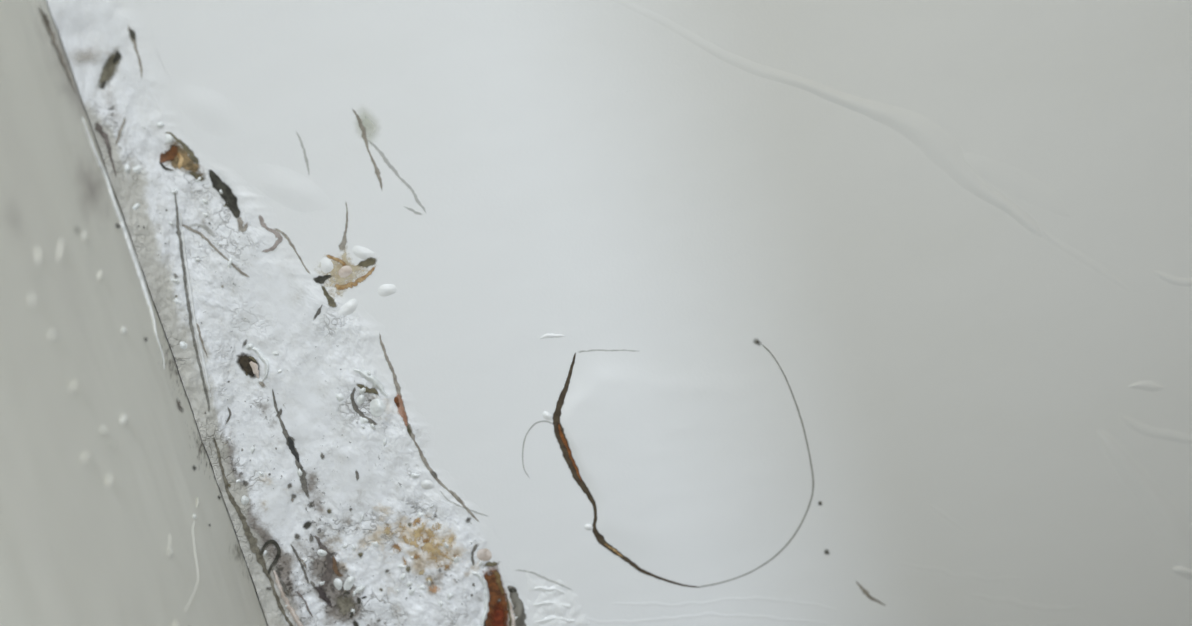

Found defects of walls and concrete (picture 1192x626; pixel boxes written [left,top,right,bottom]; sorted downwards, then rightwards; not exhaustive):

rust [160,145,178,163]
spalling [46,0,590,626]
crack [380,335,478,521]
leakage [334,576,367,626]